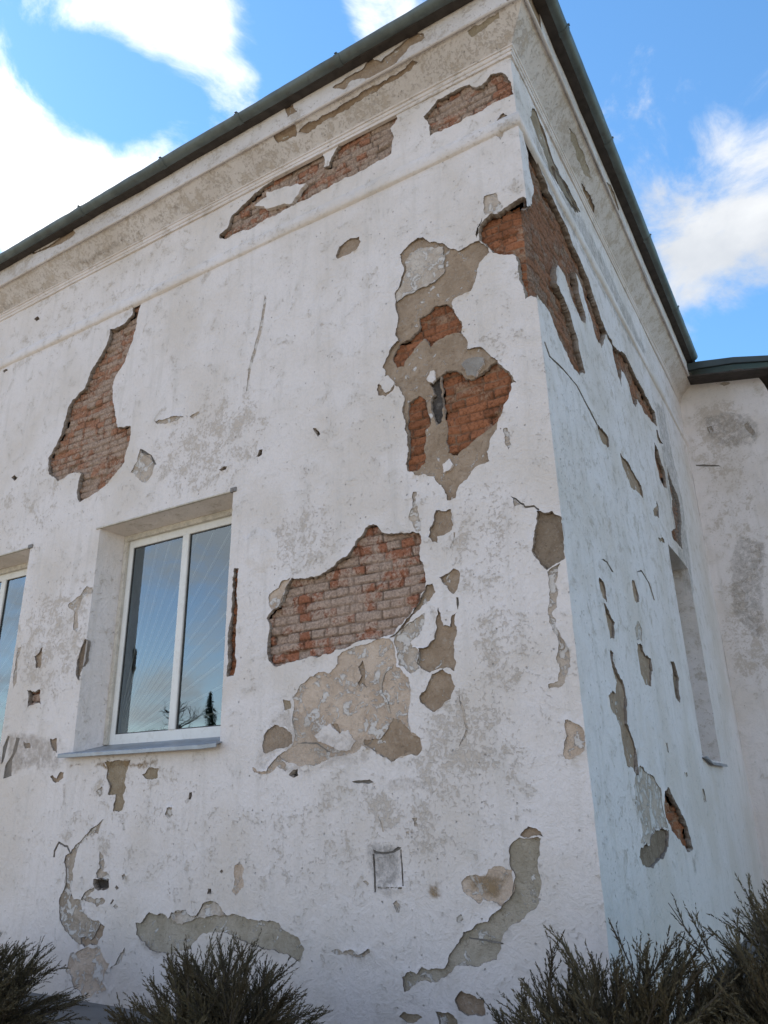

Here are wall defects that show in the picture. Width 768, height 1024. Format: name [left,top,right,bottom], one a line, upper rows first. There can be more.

spalling [423,72,513,136]
spalling [219,118,397,239]
spalling [48,305,156,502]
crack [246,297,266,391]
flaking render [253,108,682,778]
crack [544,342,609,447]
spalling [226,568,239,677]
peeling [599,577,693,869]
flaking render [59,760,130,998]
flaking render [136,889,304,962]
flaking render [402,826,542,992]